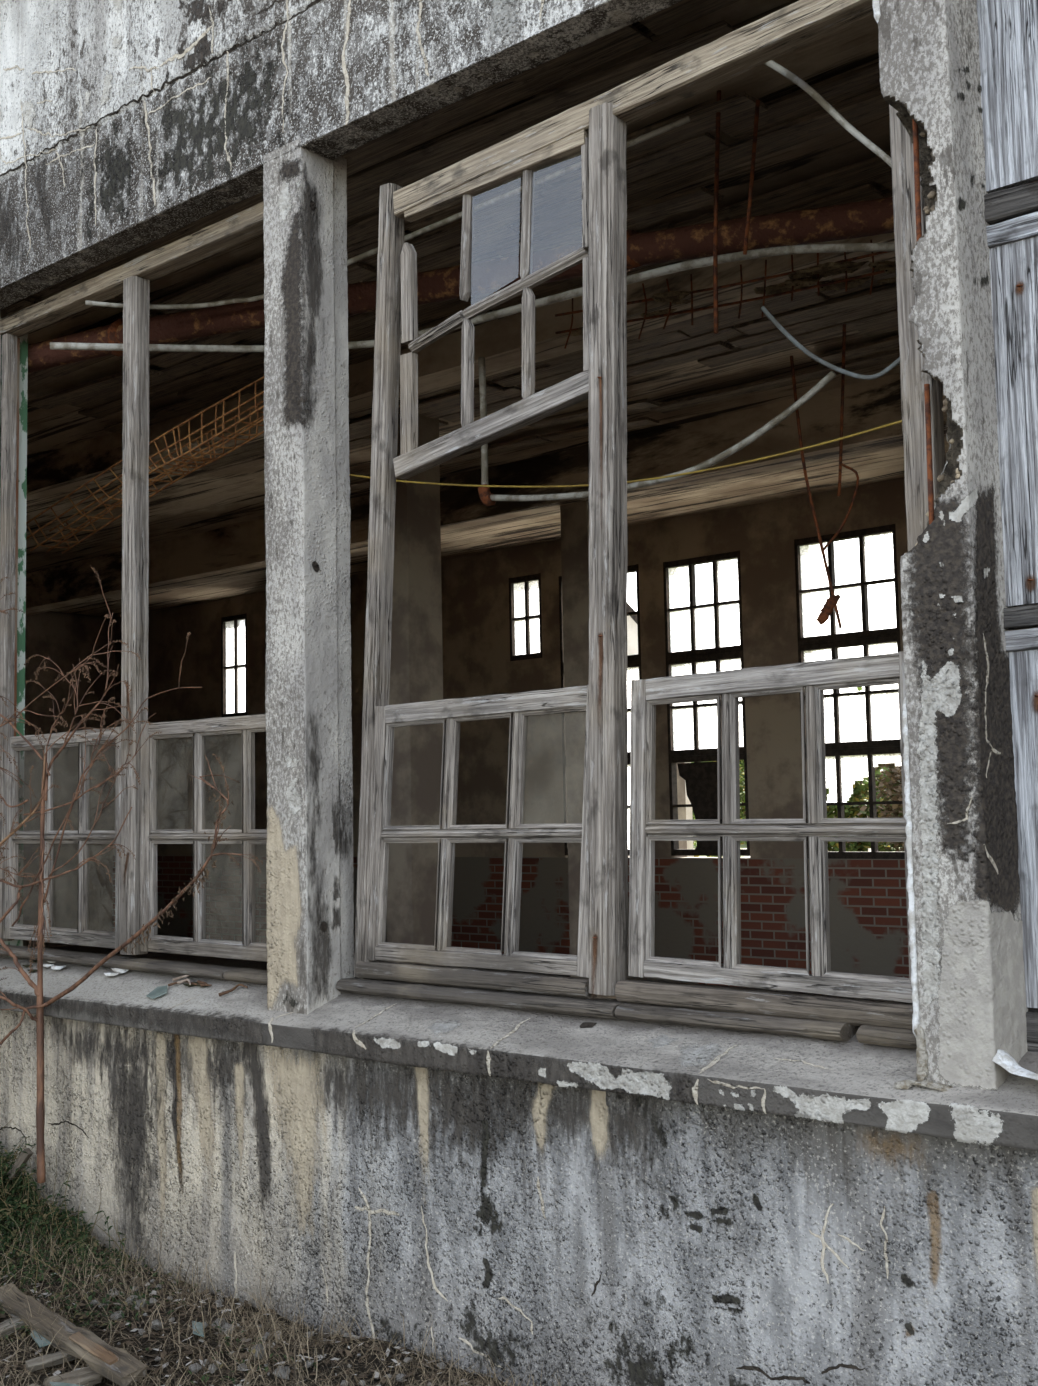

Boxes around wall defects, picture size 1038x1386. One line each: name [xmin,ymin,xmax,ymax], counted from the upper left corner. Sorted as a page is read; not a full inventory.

crack [0,0,351,255]
damp [279,159,324,426]
crack [416,0,429,76]
spalling [884,95,937,281]
spalling [906,340,978,553]
damp [306,716,351,996]
peeling [917,638,962,1012]
damp [0,990,719,1250]
peeling [538,1061,672,1100]
peeling [773,1084,931,1134]
damp [482,1258,493,1288]
damp [449,1303,532,1378]